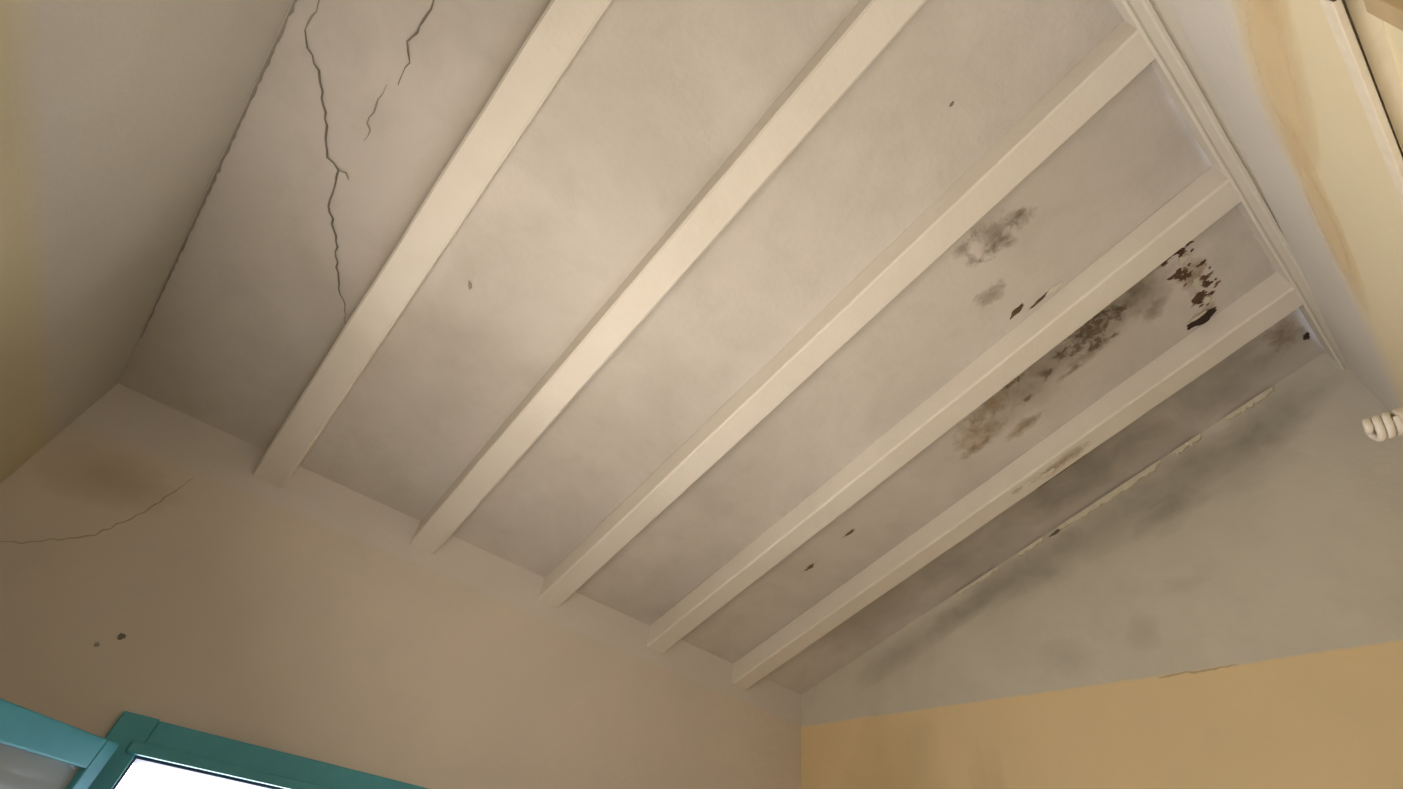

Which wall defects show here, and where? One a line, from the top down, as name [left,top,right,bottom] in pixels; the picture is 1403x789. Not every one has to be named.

crack [365,0,434,139]
crack [141,0,349,338]
damp [1044,307,1125,378]